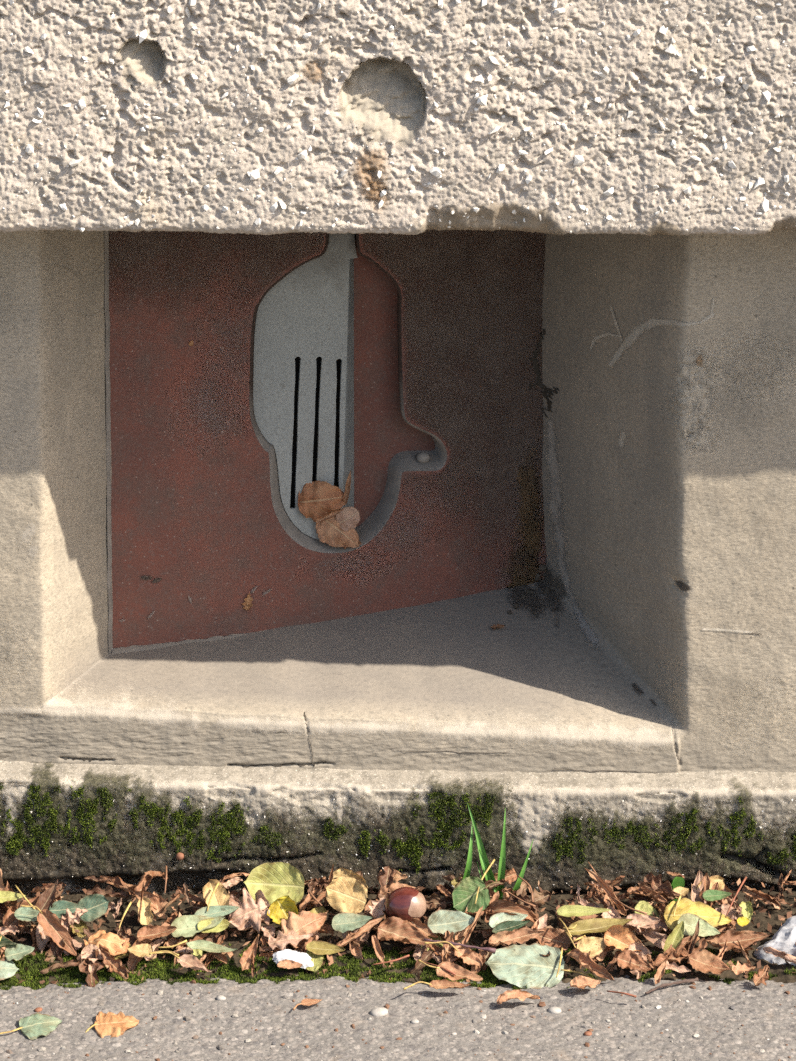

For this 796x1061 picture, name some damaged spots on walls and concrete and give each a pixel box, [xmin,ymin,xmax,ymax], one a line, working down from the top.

spalling [448,5,525,113]
spalling [649,1,680,57]
spalling [687,66,725,85]
spalling [4,0,462,230]
spalling [473,115,558,191]
spalling [546,97,612,130]
spalling [655,113,783,186]
spalling [410,179,590,235]
spalling [628,151,717,236]
spalling [727,167,796,234]
crack [228,712,334,768]
leakage [0,762,796,897]